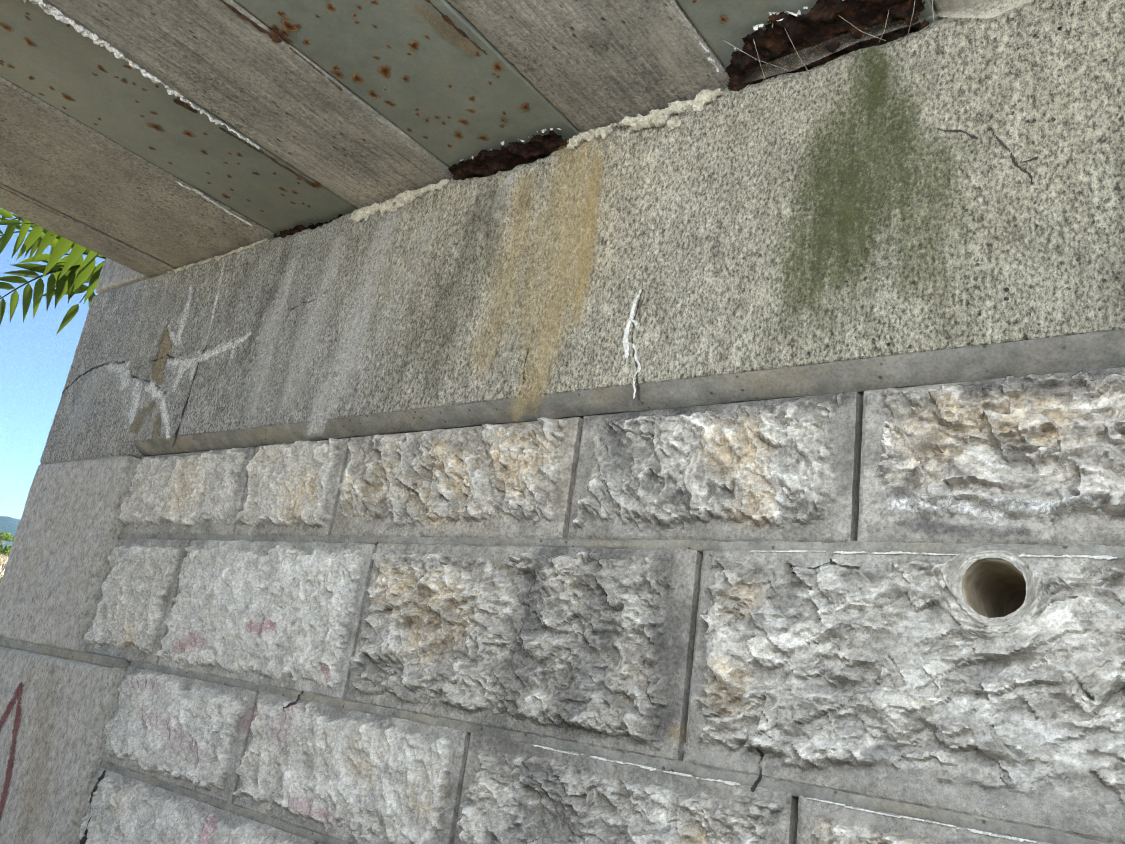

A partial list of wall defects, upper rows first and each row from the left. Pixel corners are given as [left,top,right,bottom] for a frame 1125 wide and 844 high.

rust [93,65,163,131]
damp [23,0,260,150]
rust [173,98,198,113]
damp [175,181,253,226]
rust [183,127,322,207]
rust [273,214,345,238]
rust [220,0,409,106]
rust [415,96,474,147]
rust [425,0,503,84]
crack [937,128,1038,185]
crack [622,289,644,405]
crack [62,346,207,447]